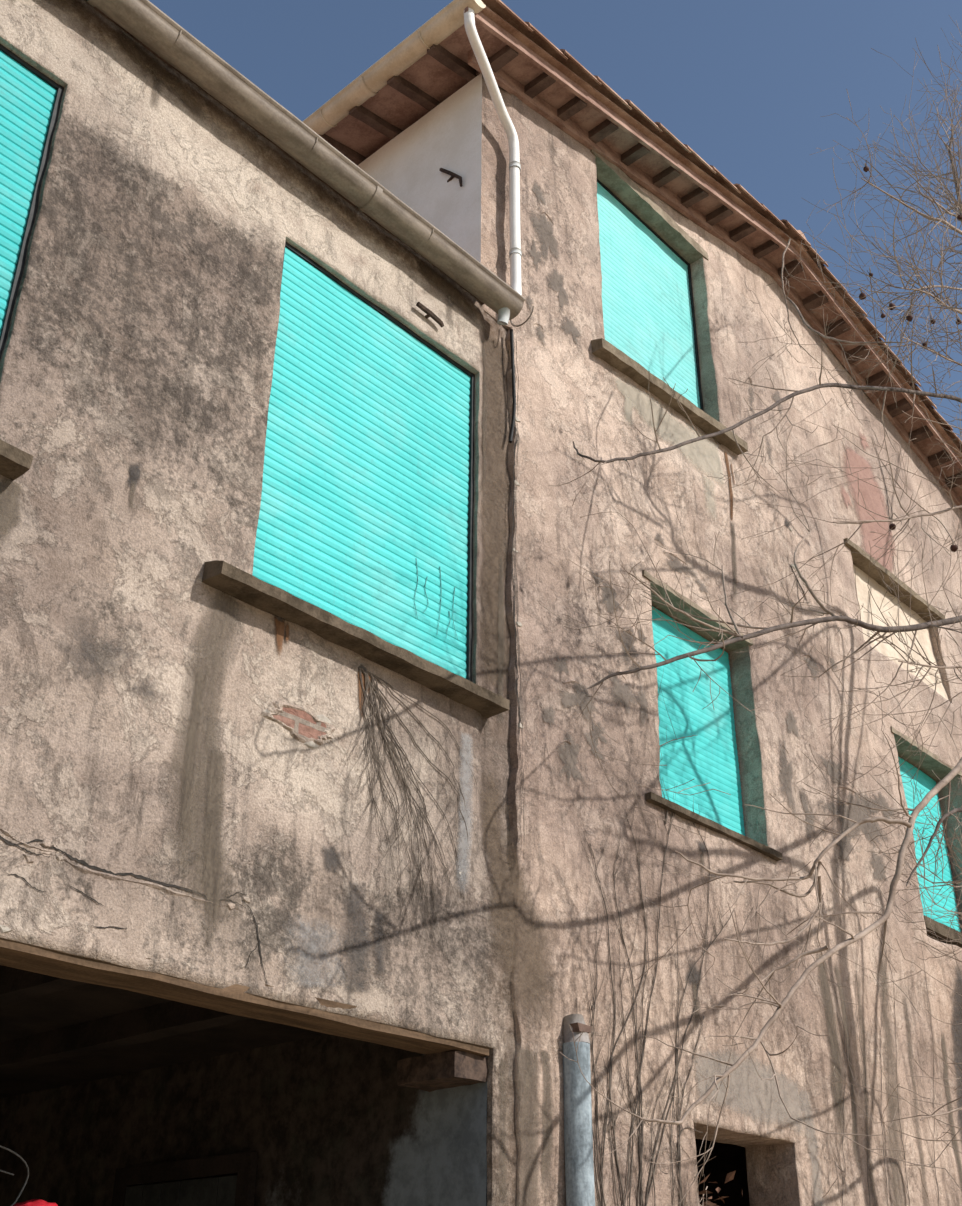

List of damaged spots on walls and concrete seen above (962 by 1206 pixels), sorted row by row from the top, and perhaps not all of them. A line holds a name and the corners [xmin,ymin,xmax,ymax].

leakage [178,591,238,921]
flaking render [258,700,335,749]
crack [0,828,270,991]
leakage [325,848,340,870]
leakage [349,885,383,989]